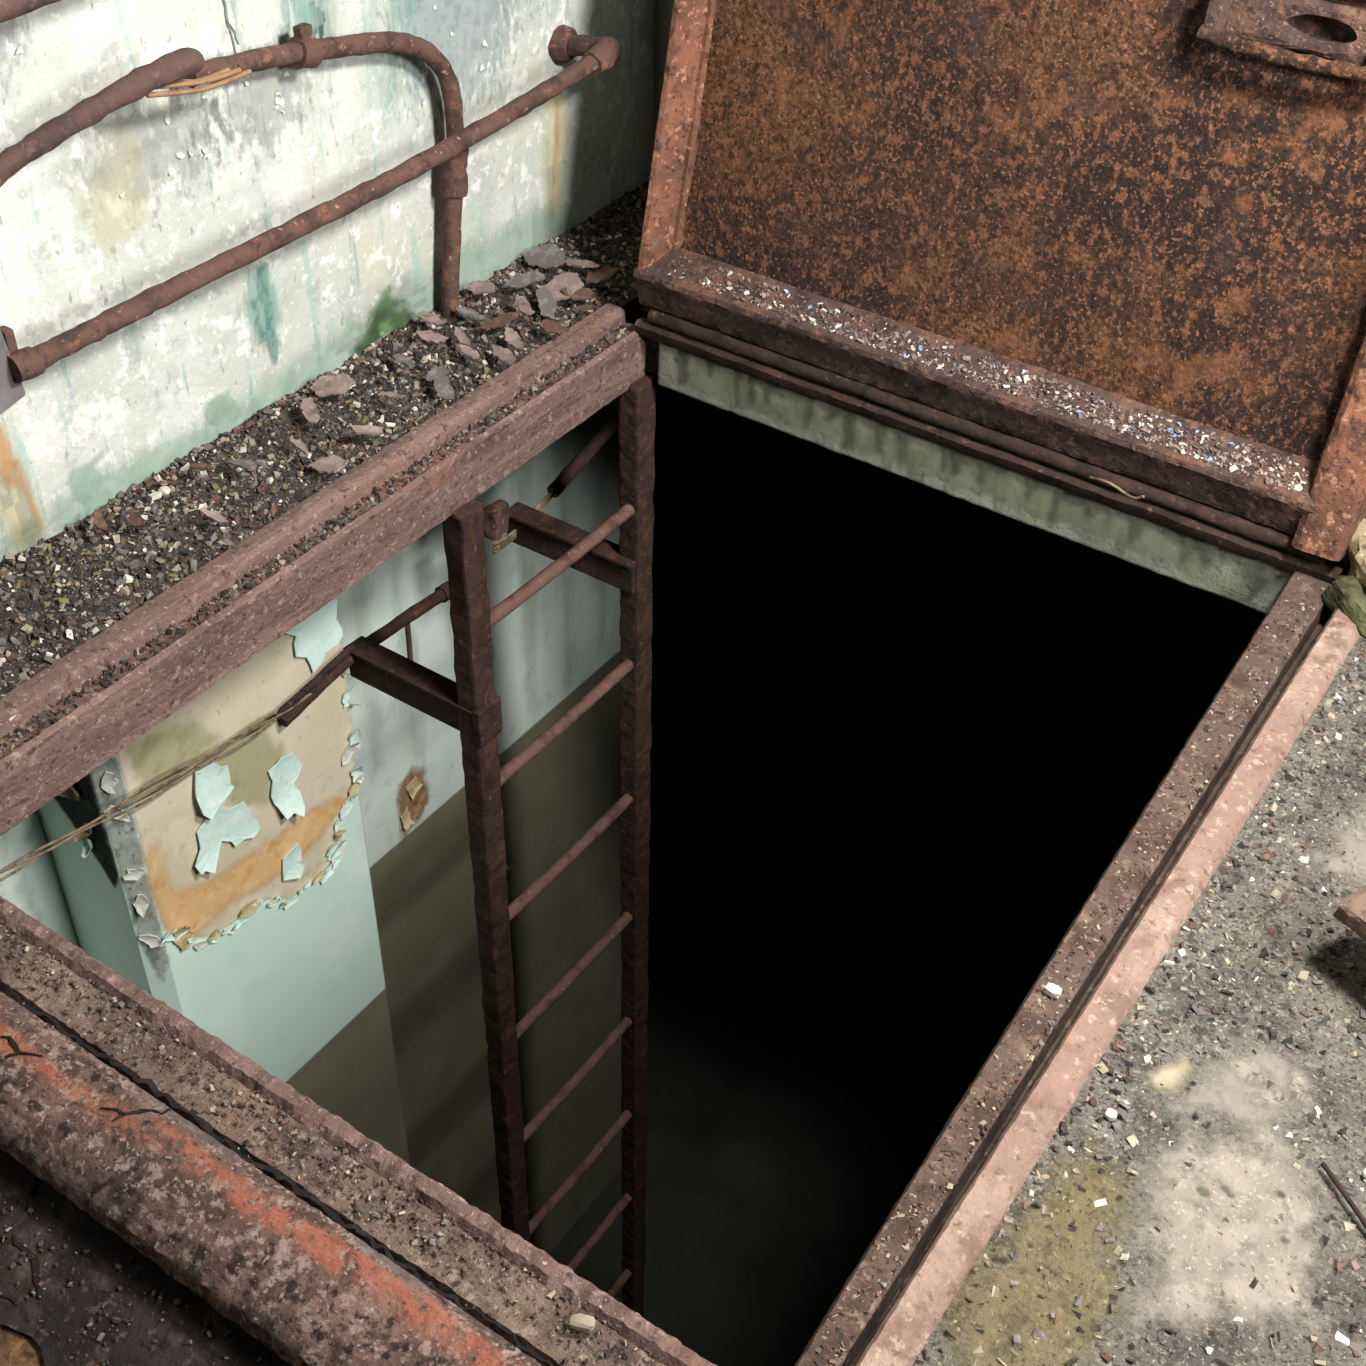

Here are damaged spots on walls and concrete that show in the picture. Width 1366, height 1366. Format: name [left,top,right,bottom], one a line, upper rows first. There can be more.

corrosion [0,433,40,547]
peeling [54,599,364,980]
peeling [398,769,428,836]